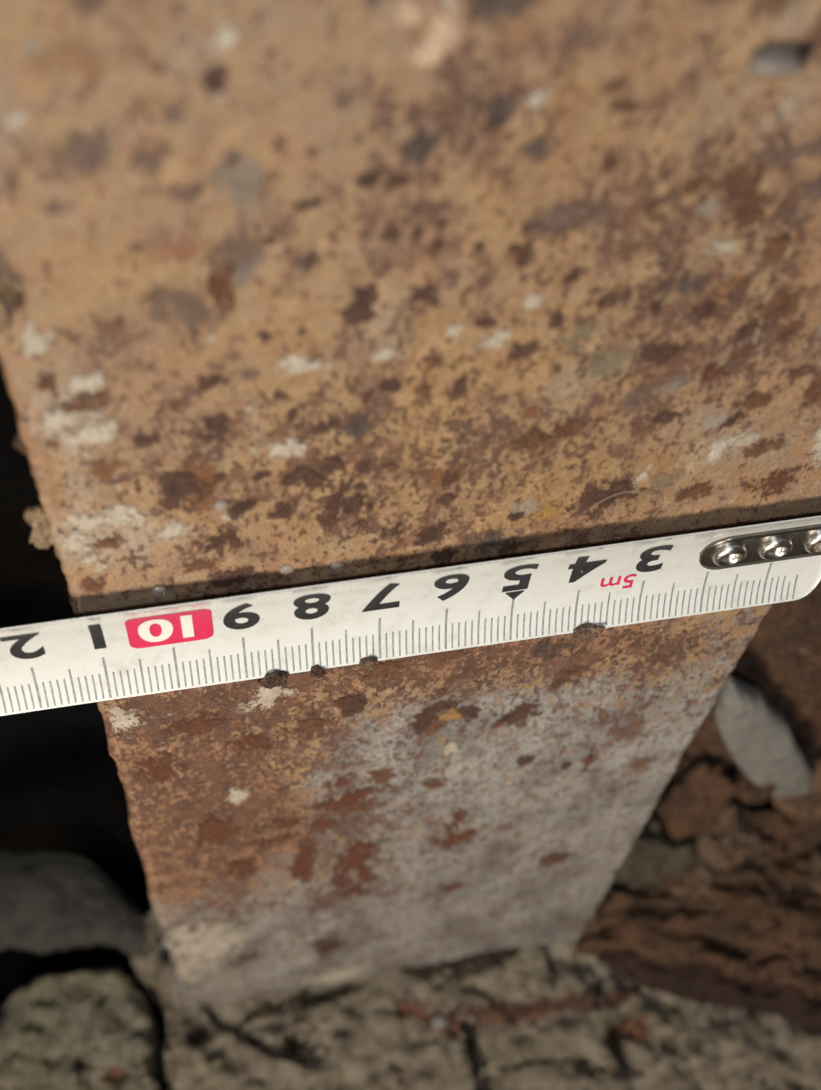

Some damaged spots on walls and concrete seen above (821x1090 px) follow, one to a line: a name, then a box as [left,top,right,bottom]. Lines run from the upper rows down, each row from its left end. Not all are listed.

rust [340,284,379,326]
rust [35,372,113,417]
rust [718,391,781,430]
rust [248,458,376,533]
rust [24,505,53,549]
rust [154,460,257,588]
rust [414,474,641,566]
rust [428,647,481,662]
rust [225,662,404,756]
rust [408,689,482,737]
rust [491,701,542,730]
rust [225,768,405,884]